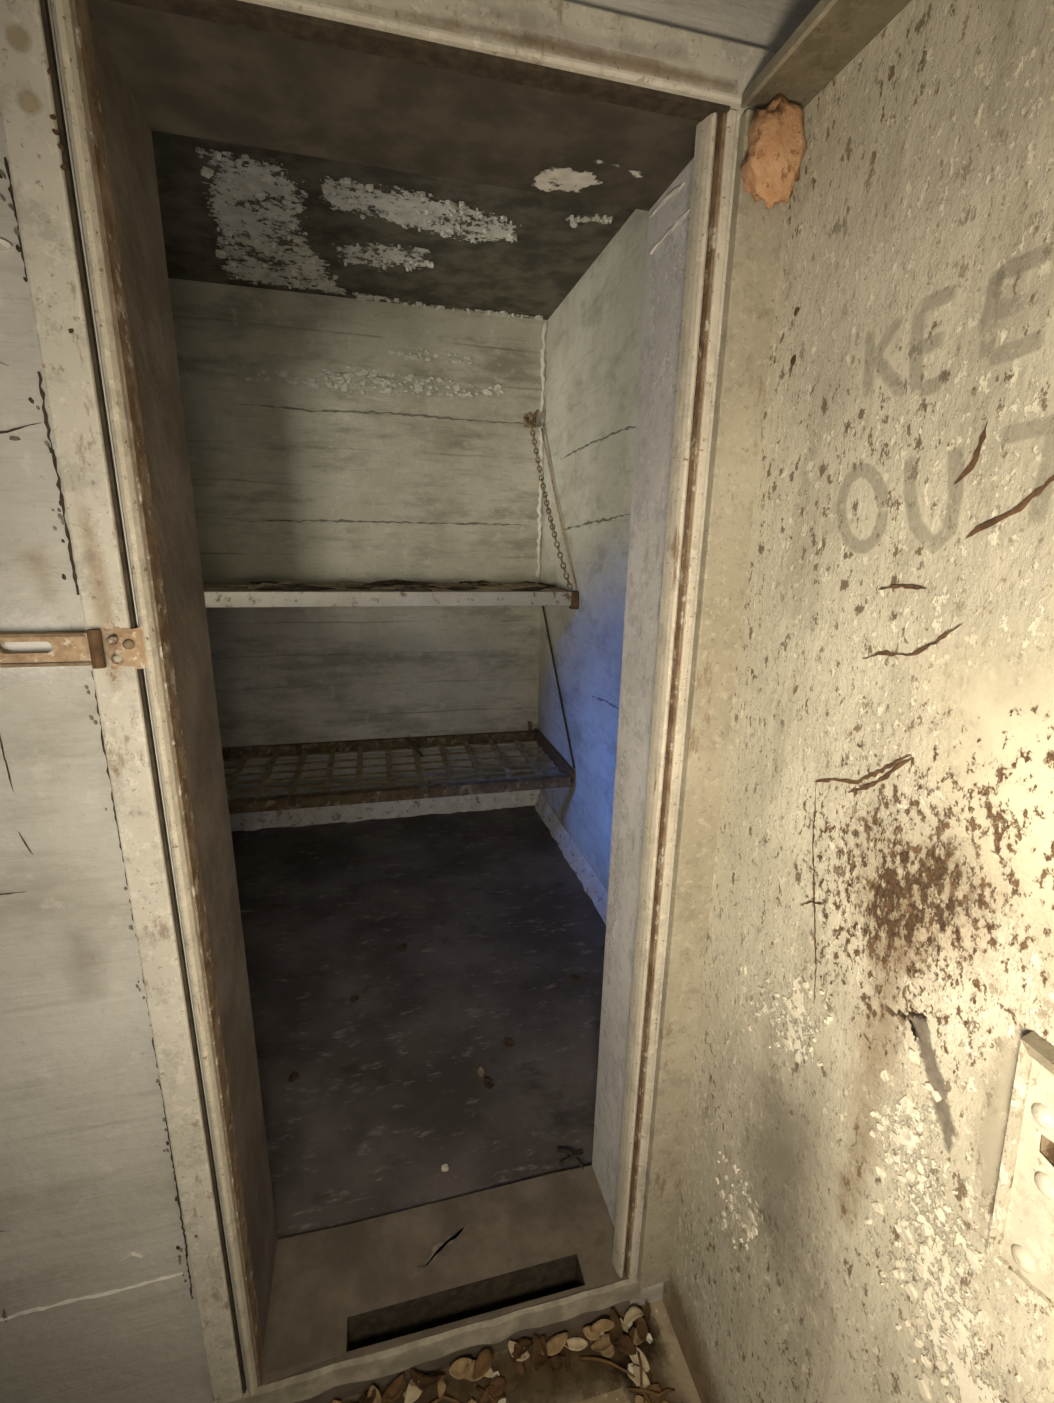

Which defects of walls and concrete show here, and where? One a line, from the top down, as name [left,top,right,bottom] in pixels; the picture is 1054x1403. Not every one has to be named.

peeling [532,160,643,193]
peeling [195,147,543,321]
peeling [565,214,613,228]
crack [0,362,80,595]
crack [954,421,988,485]
crack [965,476,1054,539]
crack [0,736,14,792]